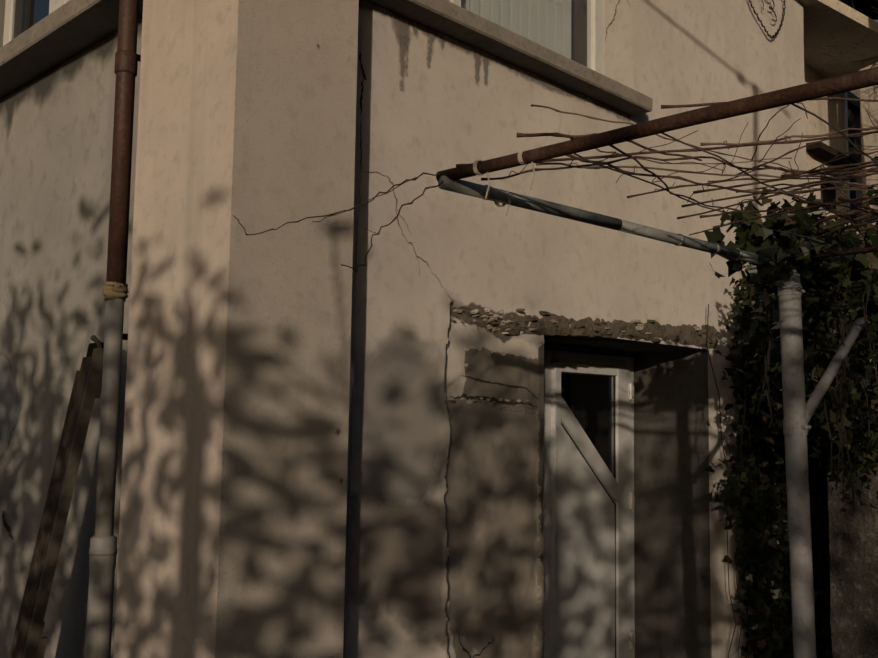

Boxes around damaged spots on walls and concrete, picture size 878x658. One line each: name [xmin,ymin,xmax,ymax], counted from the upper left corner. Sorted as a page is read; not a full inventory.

crack [355,31,456,309]
damp [359,0,630,120]
spalling [444,302,718,658]
crack [456,629,494,658]